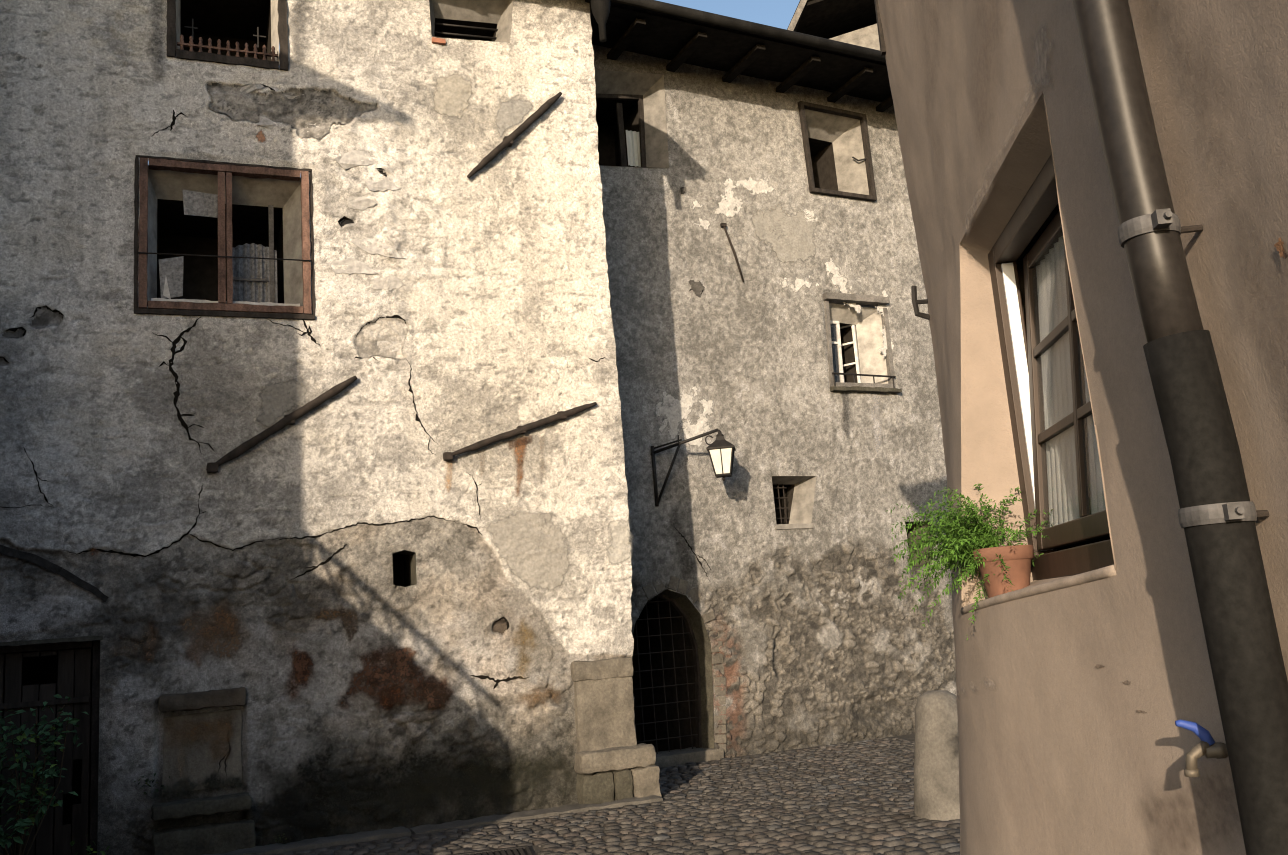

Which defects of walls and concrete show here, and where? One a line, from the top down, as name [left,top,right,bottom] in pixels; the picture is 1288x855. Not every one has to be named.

spalling [207,82,377,140]
peeling [680,176,774,230]
spalling [2,305,64,338]
crack [268,319,321,347]
crack [152,317,214,454]
crack [408,362,435,454]
corrosion [509,436,541,493]
crack [69,472,482,581]
corrosion [316,607,365,641]
spalling [492,617,509,635]
corrosion [288,649,314,698]
corrosion [340,646,453,711]